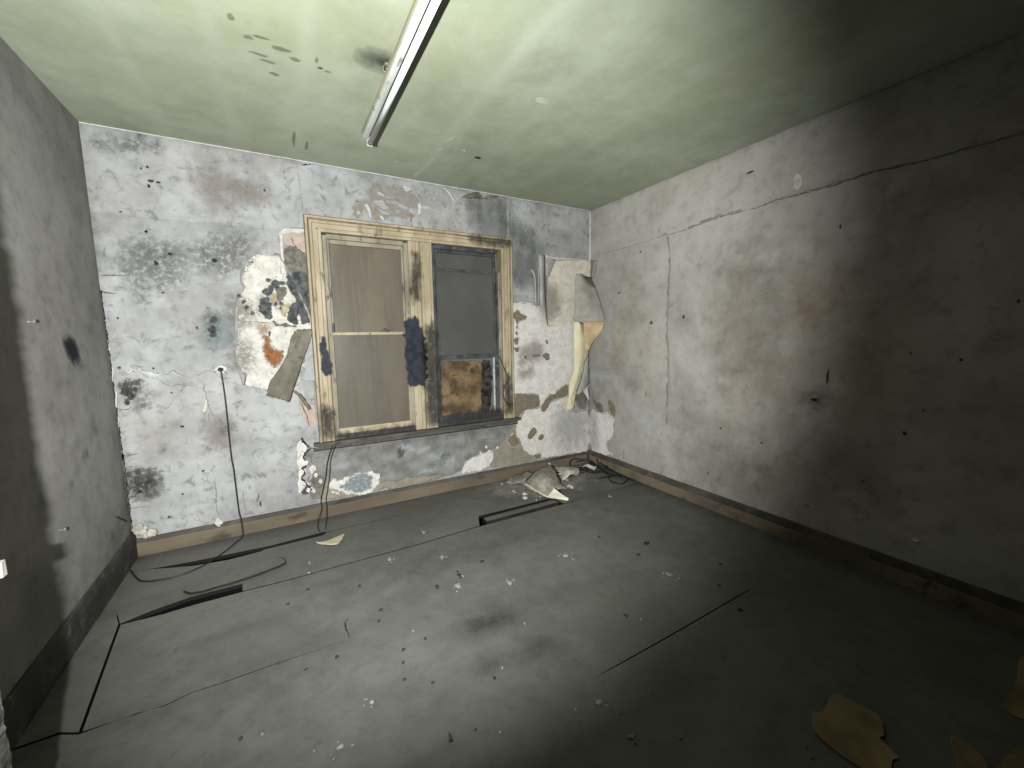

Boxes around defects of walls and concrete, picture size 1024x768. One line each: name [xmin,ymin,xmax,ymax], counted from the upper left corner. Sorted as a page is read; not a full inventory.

flaking render [215,227,311,389]
corrosion [260,324,284,368]
damp [119,379,141,405]
flaking render [302,266,616,499]
damp [126,468,160,498]